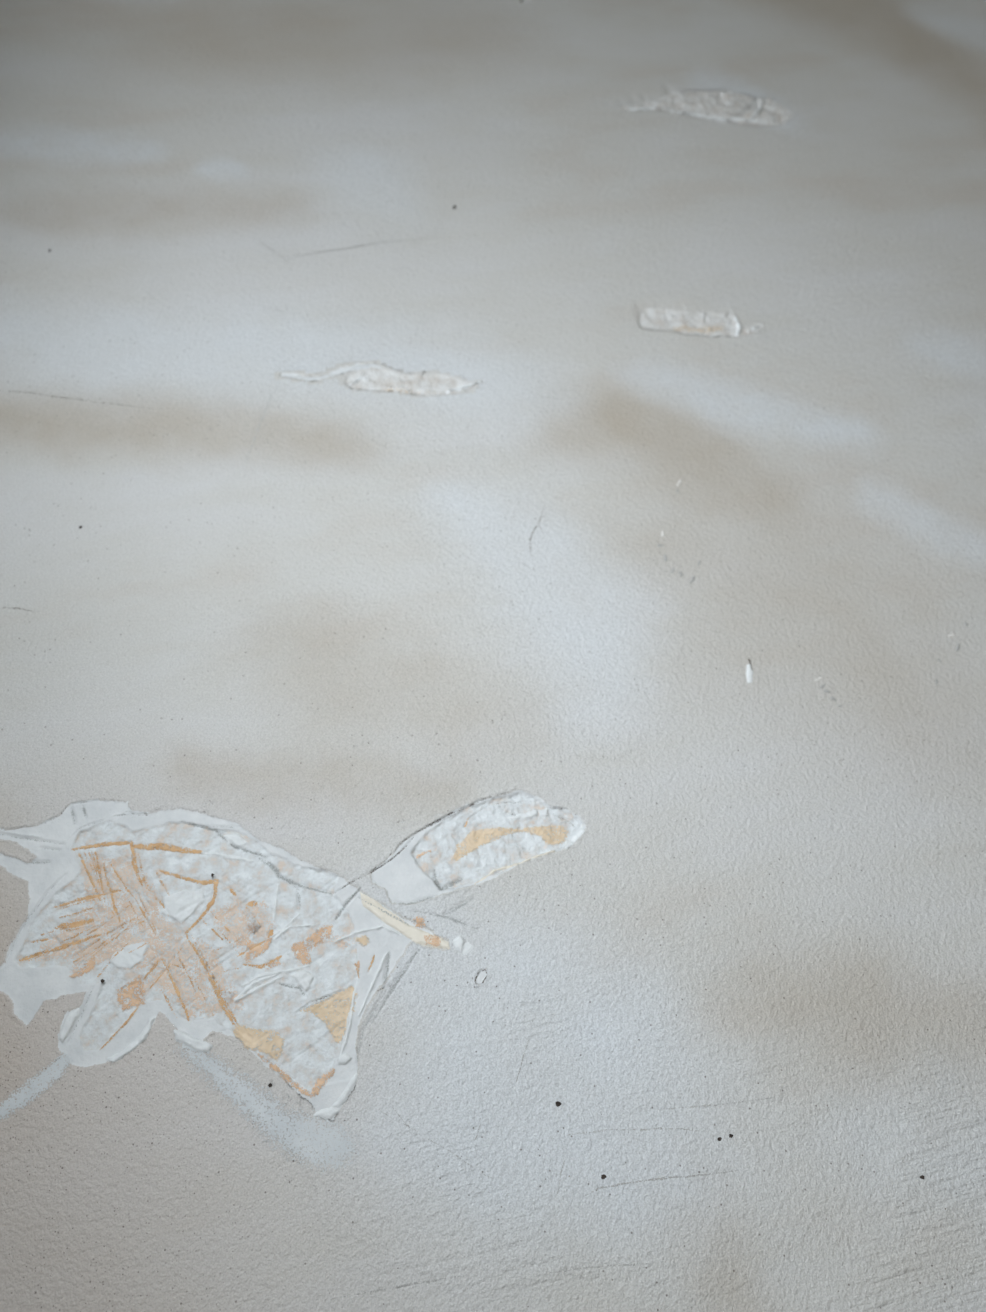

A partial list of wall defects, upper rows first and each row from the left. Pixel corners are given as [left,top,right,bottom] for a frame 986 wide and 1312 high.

spalling [620,91,792,127]
spalling [638,307,764,338]
spalling [0,787,586,1175]